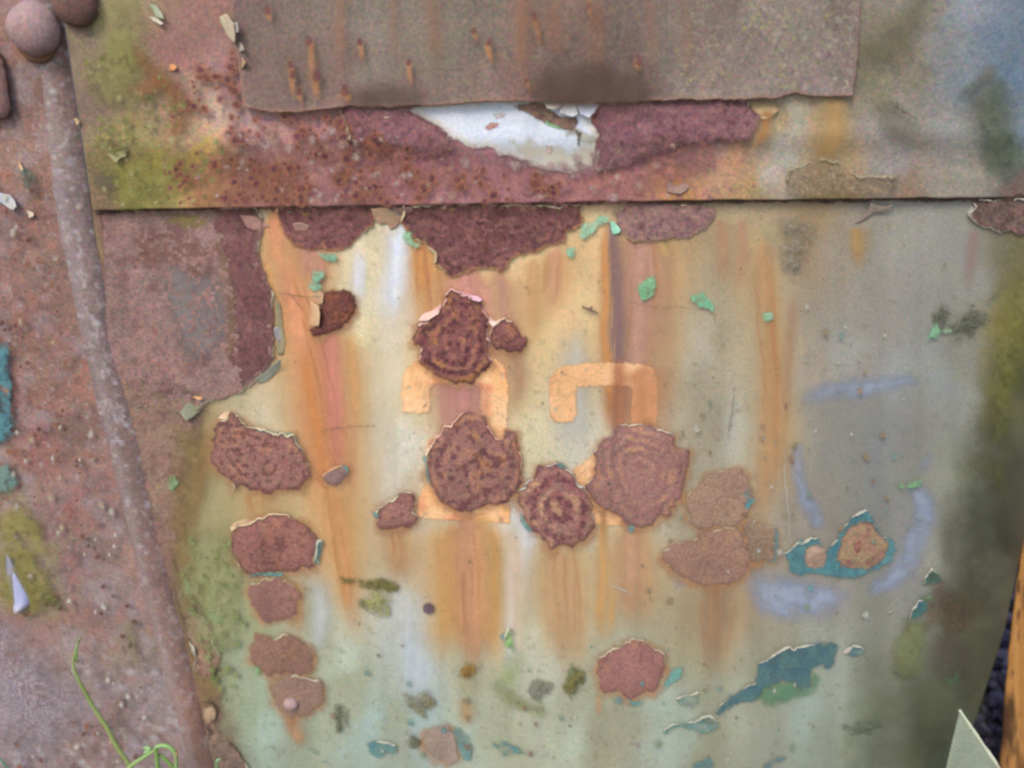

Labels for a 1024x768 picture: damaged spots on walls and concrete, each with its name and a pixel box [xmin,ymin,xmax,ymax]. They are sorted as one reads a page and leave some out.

corrosion [319,85,511,165]
peeling [406,101,599,175]
corrosion [525,99,772,178]
corrosion [786,103,897,196]
peeling [287,211,311,231]
peeling [371,208,419,248]
corrosion [400,202,782,649]
corrosion [101,207,375,768]
peeling [772,509,897,591]
corrosion [590,638,677,705]
peeling [663,642,864,734]